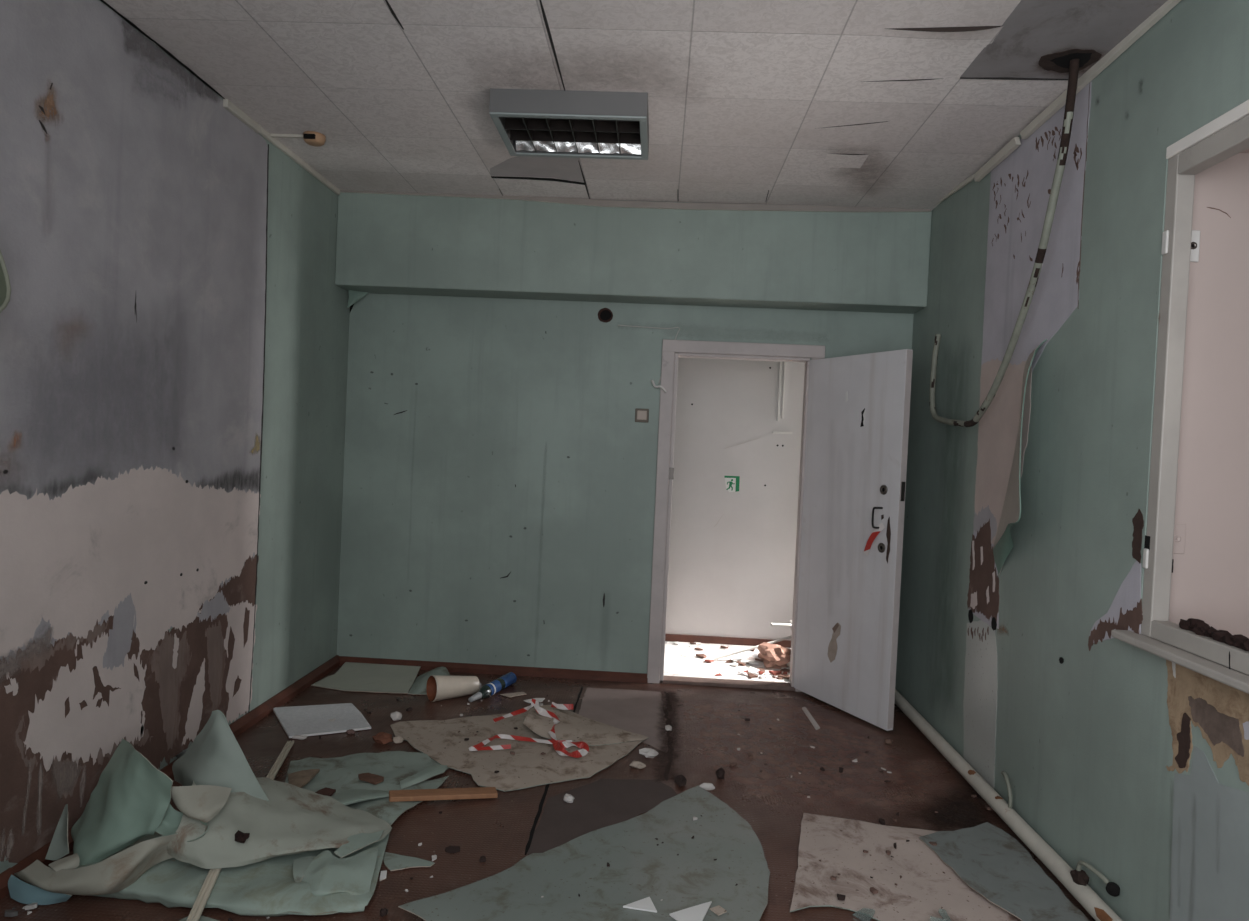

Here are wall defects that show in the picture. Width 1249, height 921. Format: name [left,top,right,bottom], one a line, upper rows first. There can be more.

spalling [1038,49,1102,74]
peeling [1036,126,1063,161]
crack [491,160,590,199]
peeling [992,170,1033,261]
water stain [202,473,258,489]
peeling [967,609,997,642]
spalling [1166,660,1249,786]